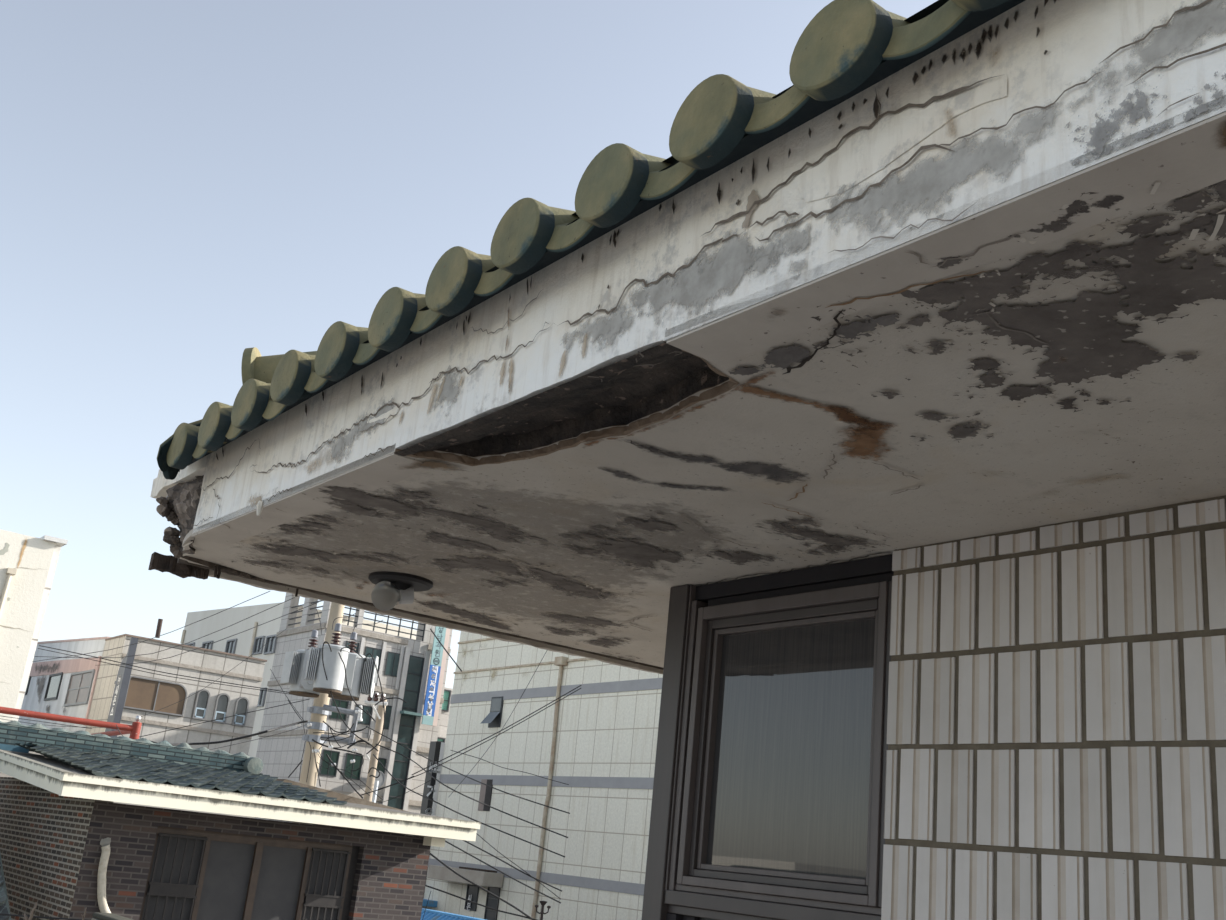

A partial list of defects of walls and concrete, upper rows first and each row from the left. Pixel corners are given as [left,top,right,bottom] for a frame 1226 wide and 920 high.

damp [827,0,1226,232]
damp [717,158,769,203]
damp [559,218,809,377]
crack [191,0,1226,528]
peeling [833,180,1226,412]
peeling [156,475,775,600]
spalling [394,328,813,466]
damp [599,468,727,491]
damp [629,442,805,483]
corrosion [585,372,893,460]
peeling [755,515,890,555]
peeling [543,612,634,661]